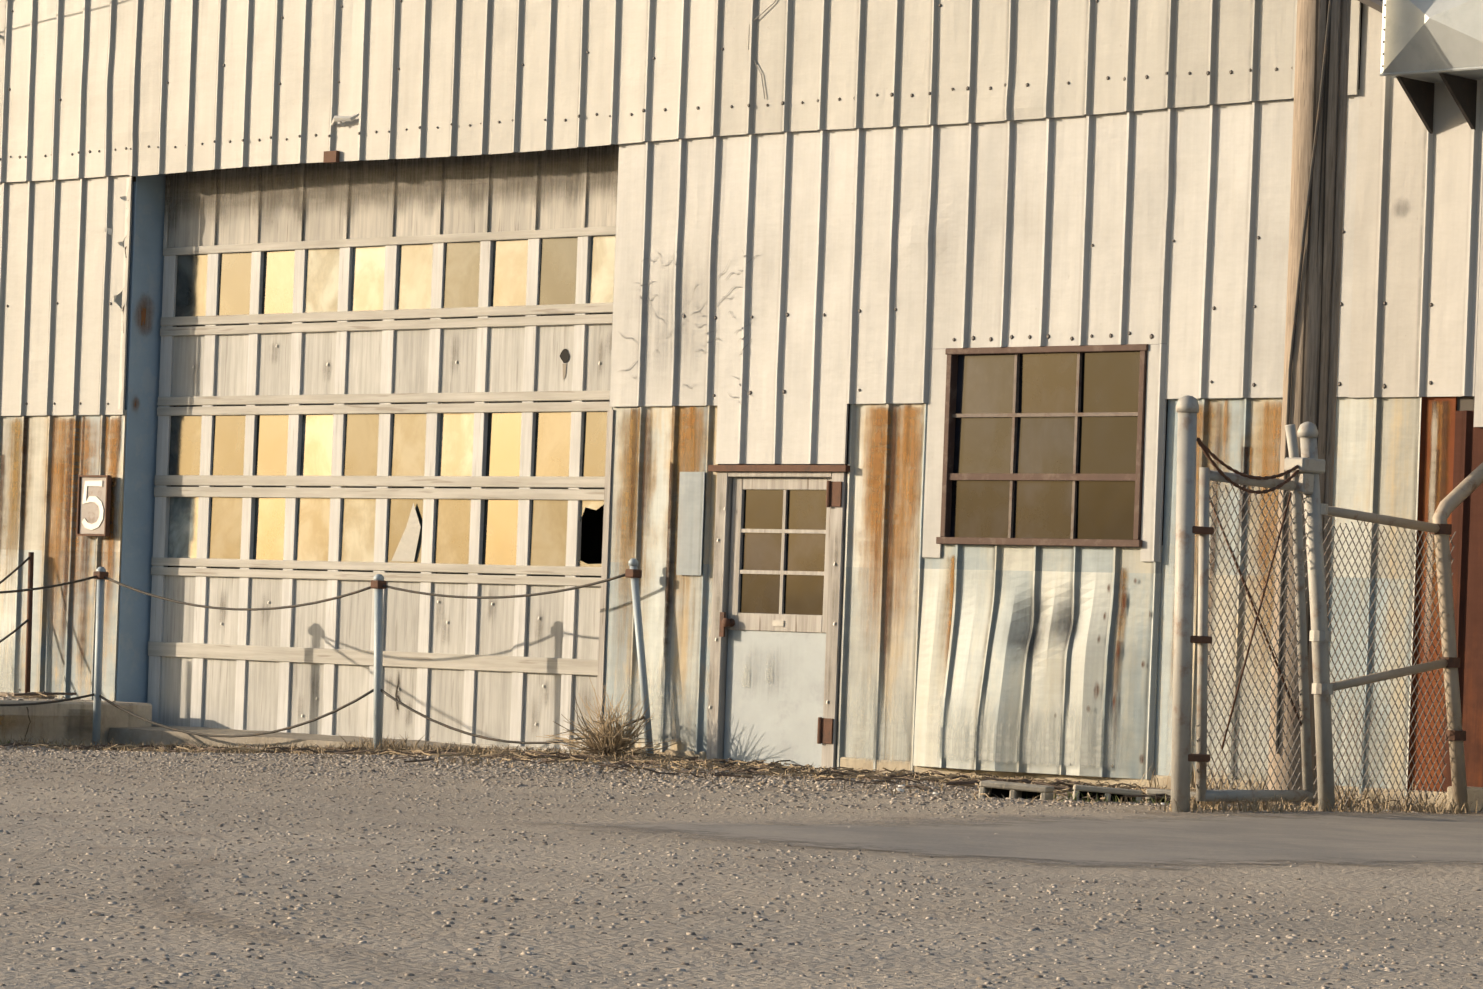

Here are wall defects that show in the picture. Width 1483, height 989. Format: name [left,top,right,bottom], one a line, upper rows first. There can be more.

corrosion [0,417,28,531]
corrosion [50,400,137,663]
corrosion [620,408,650,556]
corrosion [664,407,700,645]
corrosion [868,405,919,648]
corrosion [1427,401,1448,587]